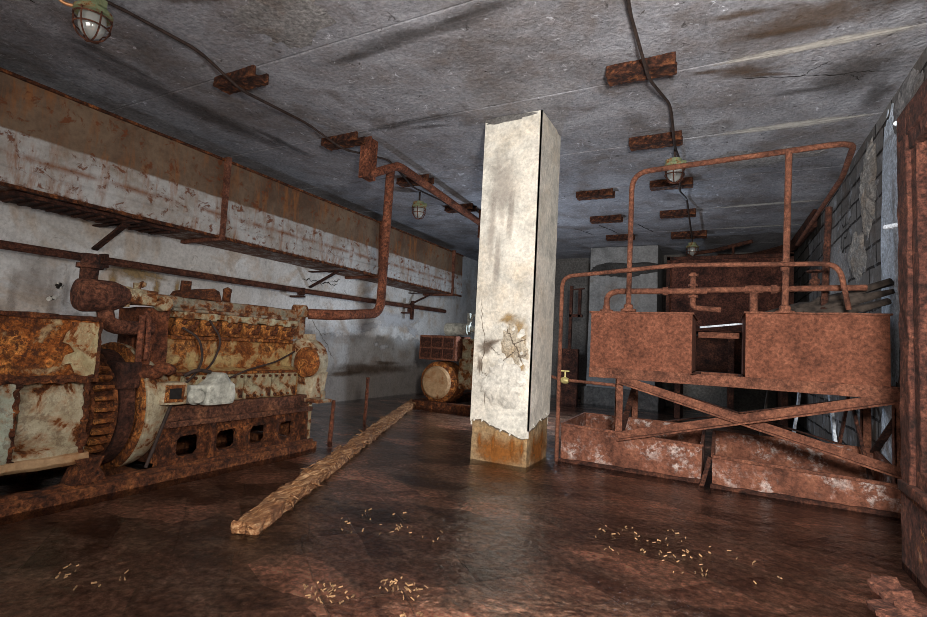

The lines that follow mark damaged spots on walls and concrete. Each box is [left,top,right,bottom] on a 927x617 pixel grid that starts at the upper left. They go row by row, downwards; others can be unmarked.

damp [728,26,912,63]
peeling [829,68,925,386]
peeling [471,412,549,440]